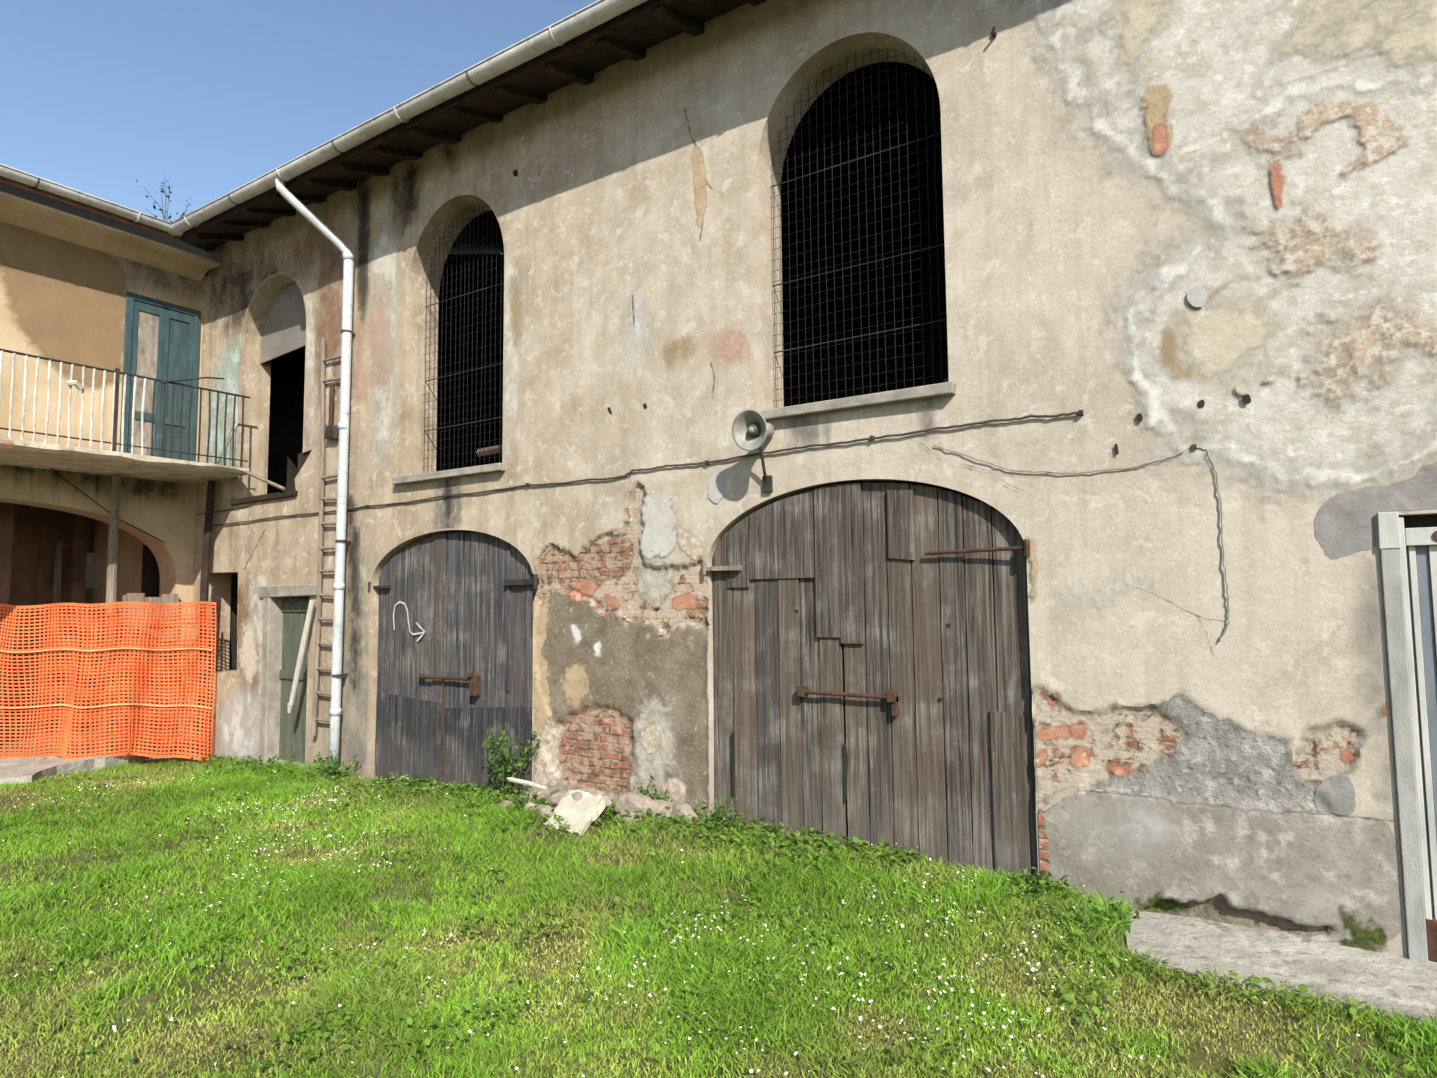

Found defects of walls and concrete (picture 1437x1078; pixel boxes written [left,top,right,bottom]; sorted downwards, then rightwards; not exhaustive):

leakage [0,221,127,388]
peeling [1034,0,1437,497]
spalling [533,482,709,812]
flaking render [1033,686,1189,881]
flaking render [1292,721,1365,786]
spalling [1136,893,1387,951]